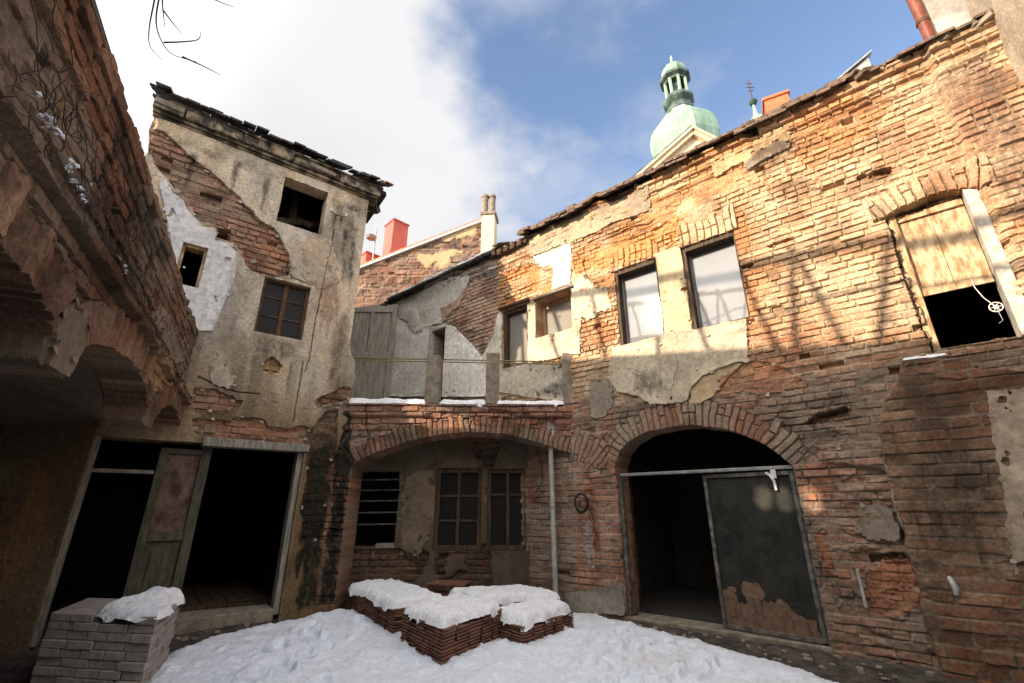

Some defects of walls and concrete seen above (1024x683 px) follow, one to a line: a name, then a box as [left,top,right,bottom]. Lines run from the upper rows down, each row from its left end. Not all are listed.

flaking render [44,297,91,377]
spalling [150,129,340,331]
spalling [192,360,351,542]
spalling [261,356,283,374]
crack [286,229,336,423]
leakage [296,500,344,578]
flaking render [390,185,809,429]
spalling [854,503,921,620]
flaking render [984,387,1024,576]